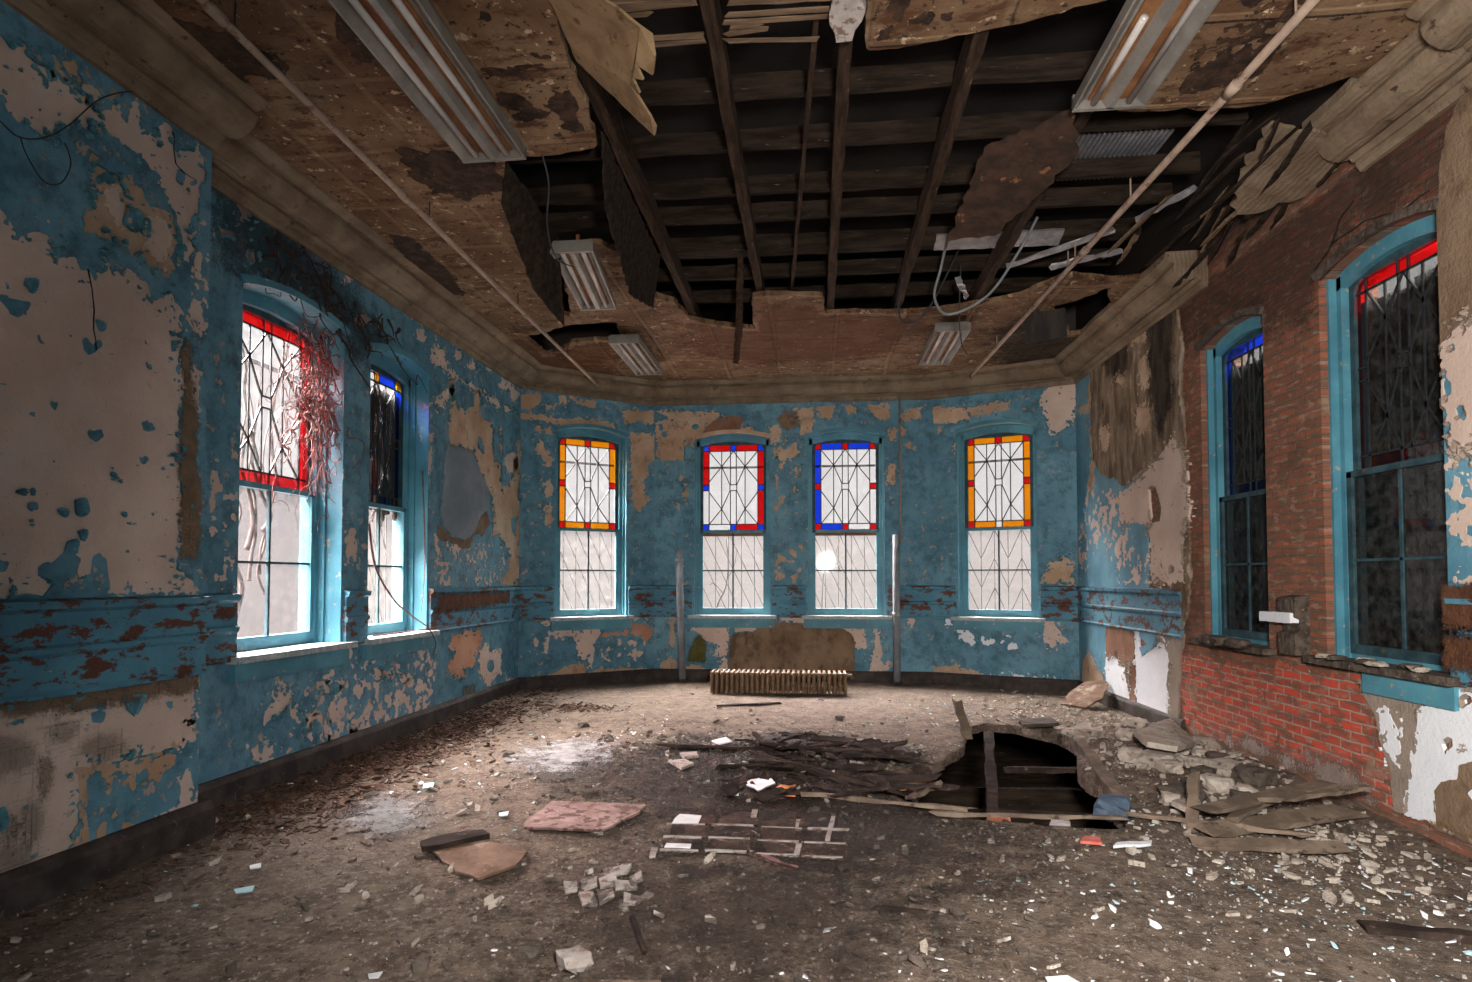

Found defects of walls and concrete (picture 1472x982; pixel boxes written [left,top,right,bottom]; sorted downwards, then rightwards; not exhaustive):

leakage [480,52,585,137]
leakage [395,147,503,202]
peeling [0,28,263,600]
flaking render [398,310,1011,587]
peeling [246,627,513,765]
flaking render [531,617,891,676]
peeling [945,619,1018,650]
peeling [932,659,1063,679]
flaking render [1036,309,1472,844]
peeling [0,676,200,873]
peeling [1059,879,1120,947]
peeling [1134,843,1472,982]